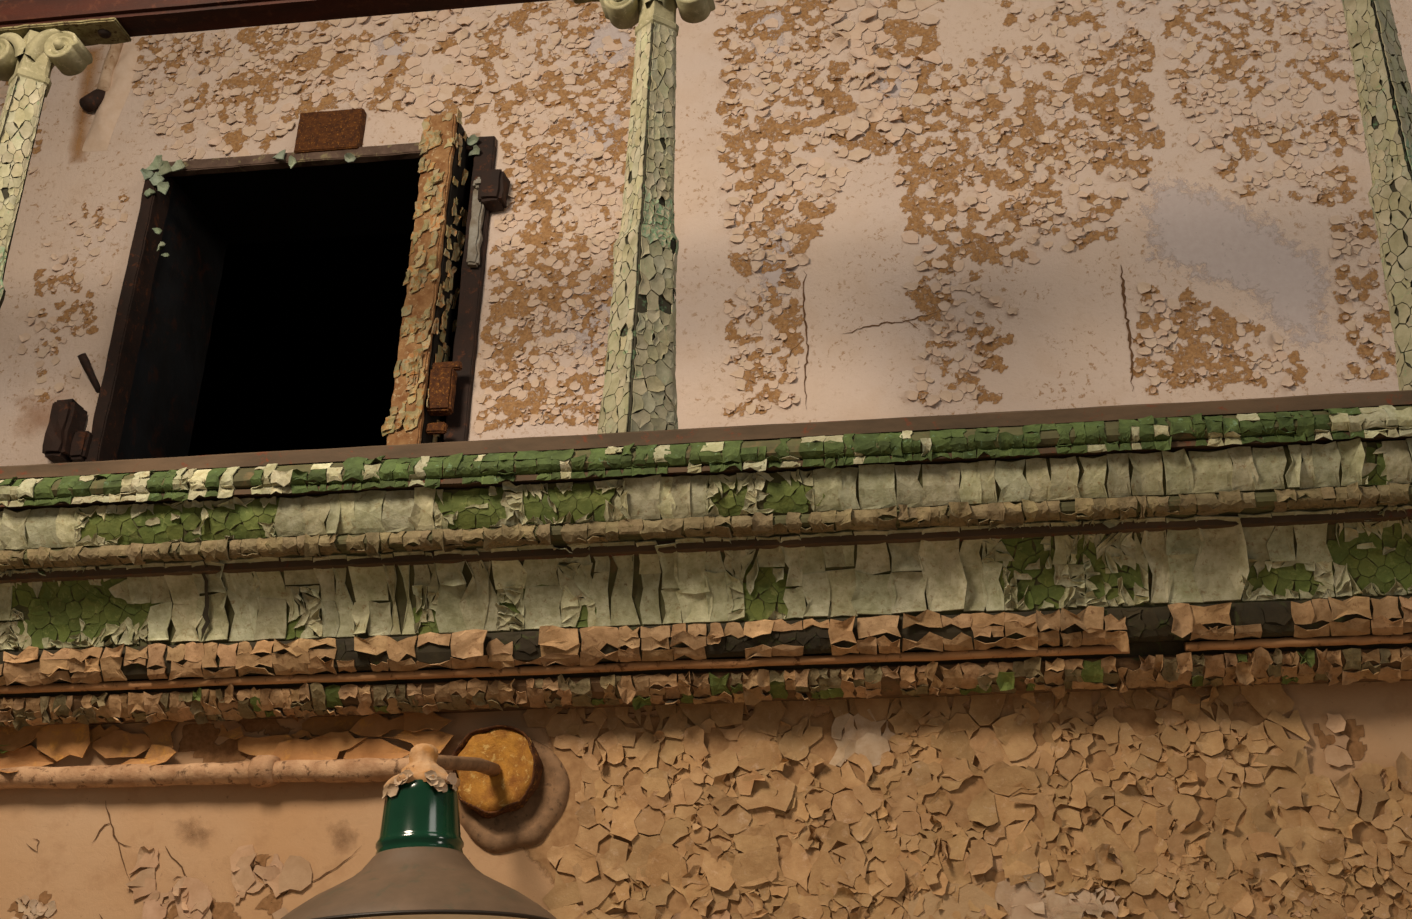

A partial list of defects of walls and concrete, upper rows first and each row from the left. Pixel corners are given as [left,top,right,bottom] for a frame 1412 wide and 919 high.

peeling [28,102,47,174]
peeling [131,0,636,436]
peeling [16,194,129,403]
crack [843,312,937,334]
peeling [0,405,1412,919]
crack [92,801,131,880]
crack [165,846,187,879]
crack [279,849,358,898]